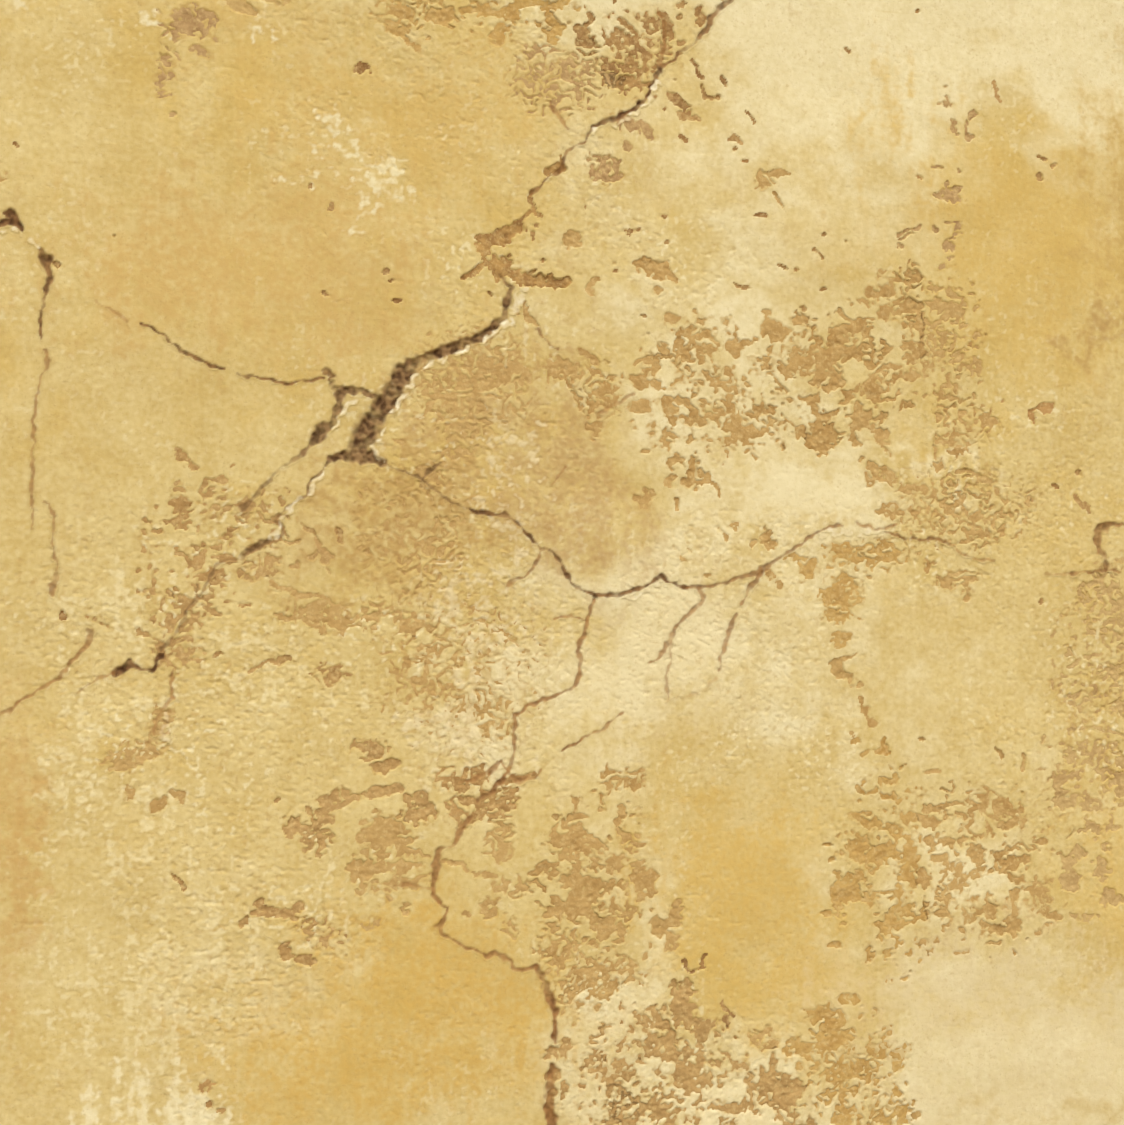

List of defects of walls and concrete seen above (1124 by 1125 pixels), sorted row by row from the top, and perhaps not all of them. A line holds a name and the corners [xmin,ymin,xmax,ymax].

spalling [155,2,219,98]
spalling [353,61,372,74]
spalling [369,0,728,143]
crack [528,0,735,197]
spalling [937,86,977,142]
spalling [931,165,963,204]
spalling [460,196,572,297]
crack [0,206,62,599]
crack [1044,520,1124,578]
crack [0,271,996,1125]
spalling [136,221,1124,1125]